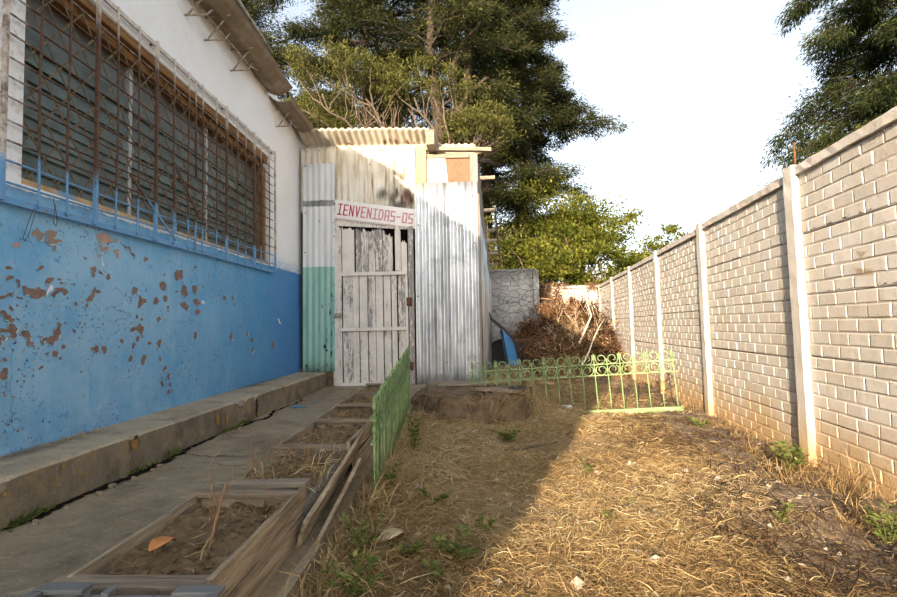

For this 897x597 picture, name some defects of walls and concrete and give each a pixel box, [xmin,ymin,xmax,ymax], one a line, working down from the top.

peeling [0,357,9,381]
peeling [31,228,62,251]
peeling [0,233,148,370]
peeling [120,269,201,394]
crack [1,395,303,530]